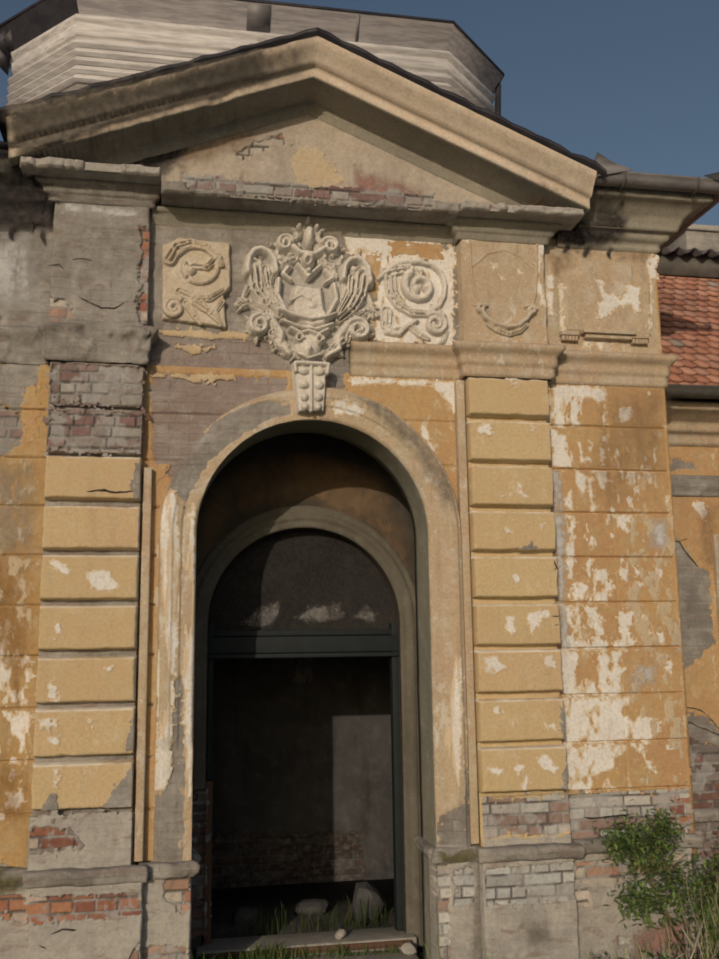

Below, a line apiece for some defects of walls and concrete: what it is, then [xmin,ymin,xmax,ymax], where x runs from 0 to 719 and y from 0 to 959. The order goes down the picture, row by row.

flaking render [236,134,293,161]
flaking render [181,173,436,209]
flaking render [49,298,73,322]
flaking render [135,227,149,326]
peeling [591,254,660,335]
peeling [582,338,619,351]
peeling [327,365,455,422]
peeling [415,424,438,454]
flaking render [0,325,367,959]
flaking render [437,384,719,959]